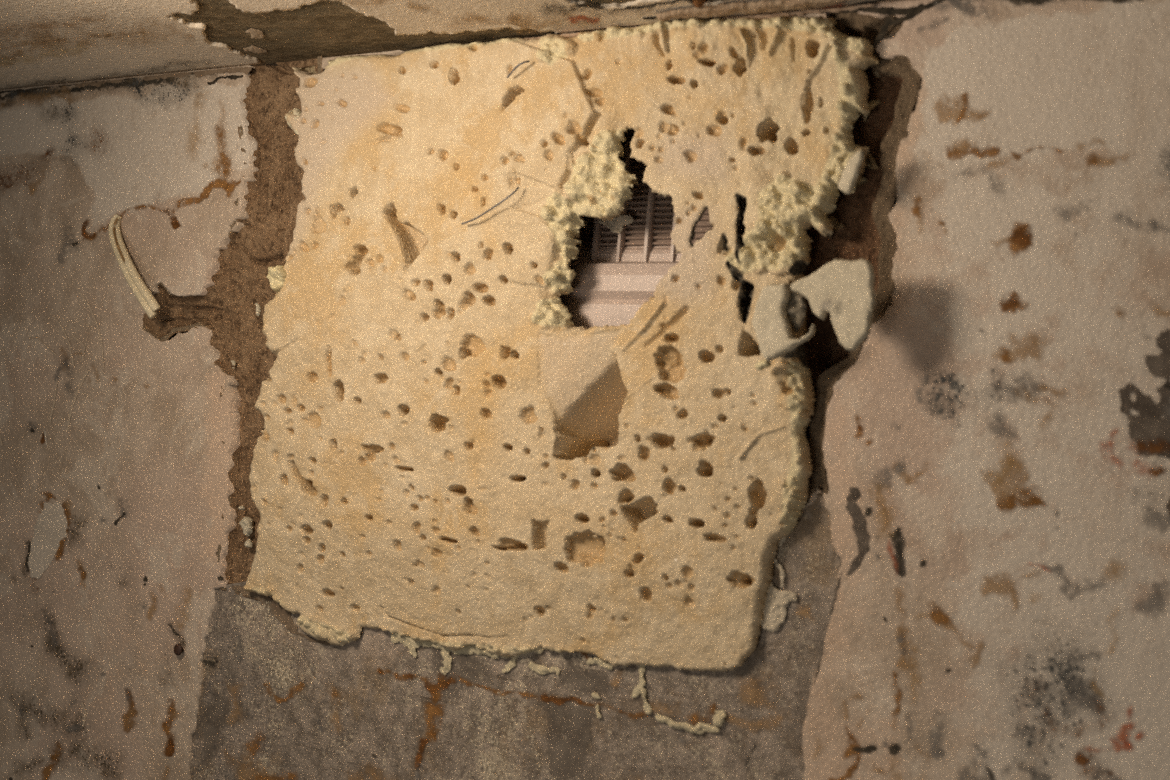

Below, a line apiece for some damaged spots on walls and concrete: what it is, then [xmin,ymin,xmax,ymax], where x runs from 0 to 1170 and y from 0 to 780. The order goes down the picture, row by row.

peeling [142,0,921,780]
peeling [28,492,89,579]
corrosion [377,668,601,779]
damp [958,620,1117,780]
damp [1111,708,1143,752]